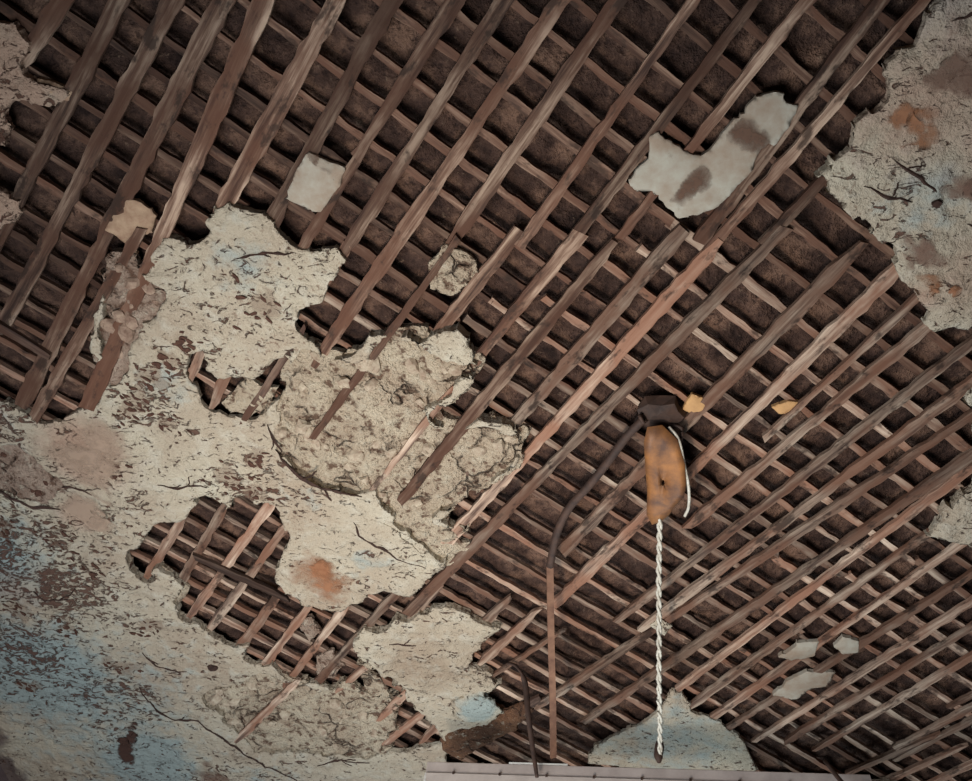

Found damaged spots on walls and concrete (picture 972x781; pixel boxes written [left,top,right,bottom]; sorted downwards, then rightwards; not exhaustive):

water stain [925,54,972,95]
crack [864,160,937,202]
water stain [950,179,972,200]
water stain [907,239,936,269]
peeling [235,289,281,324]
spalling [91,248,203,437]
spalling [199,322,531,570]
spalling [0,445,66,504]
peeling [34,531,106,587]
peeling [129,621,159,637]
crack [139,687,297,781]
spalling [204,659,406,758]